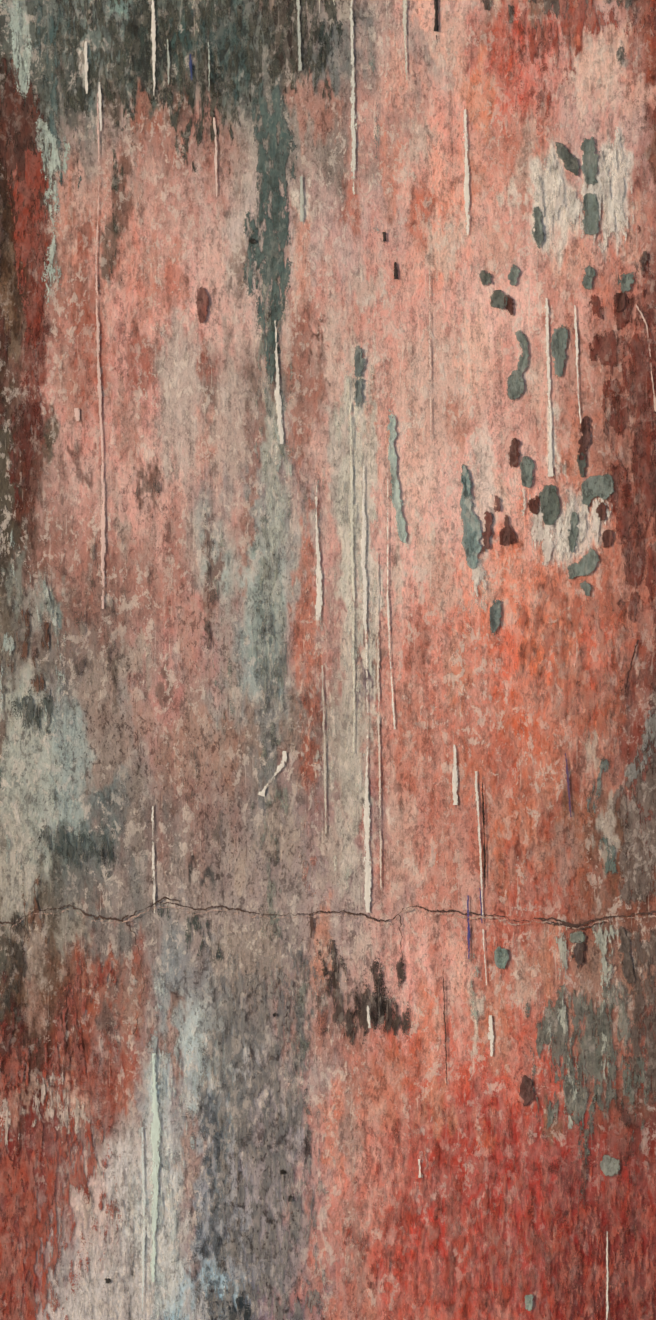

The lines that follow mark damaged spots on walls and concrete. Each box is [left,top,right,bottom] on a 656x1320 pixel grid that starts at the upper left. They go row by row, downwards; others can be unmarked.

peeling [508,0,560,33]
peeling [555,136,600,235]
peeling [532,206,544,249]
peeling [479,264,521,315]
peeling [460,464,516,569]
peeling [507,251,656,753]
peeling [489,600,502,636]
crack [625,640,639,689]
crack [0,783,656,1034]